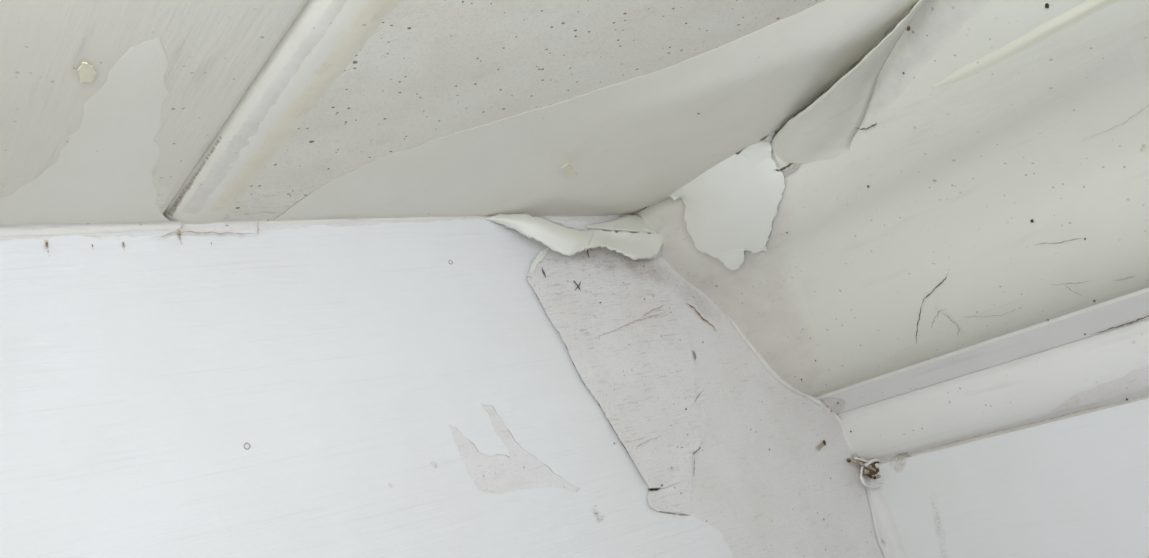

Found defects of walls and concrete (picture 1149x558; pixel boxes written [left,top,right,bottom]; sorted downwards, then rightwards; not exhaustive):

peeling [482,0,991,558]
crack [916,273,1024,344]